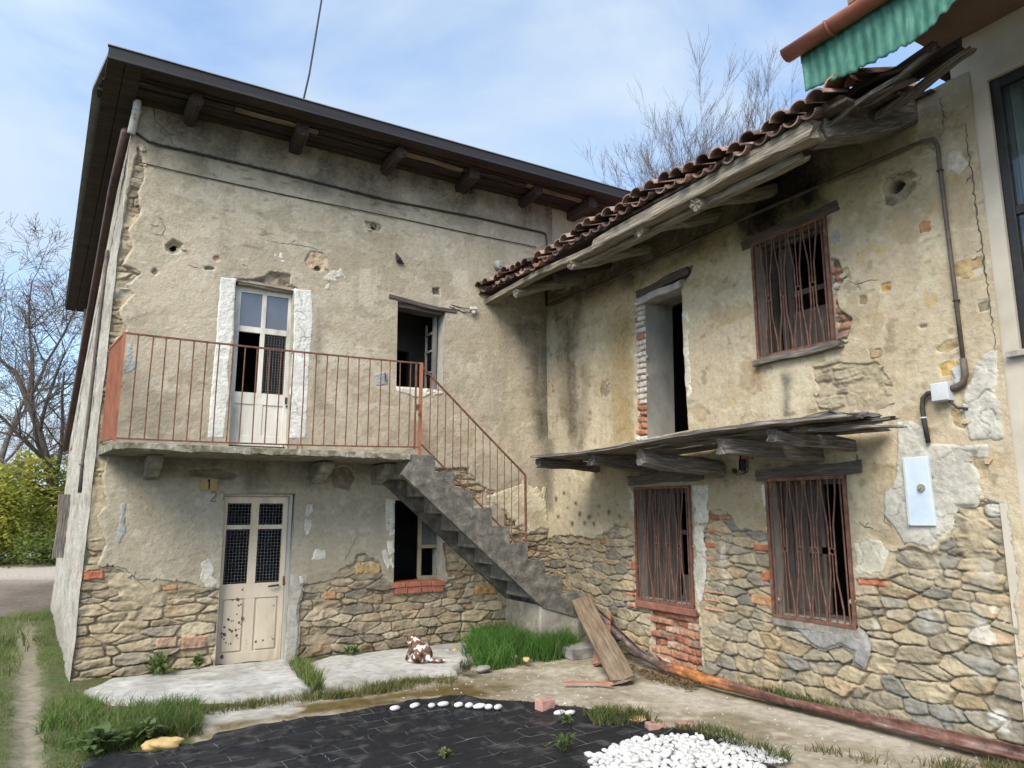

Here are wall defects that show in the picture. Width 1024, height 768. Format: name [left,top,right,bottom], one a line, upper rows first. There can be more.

flaking render [305,249,328,271]
flaking render [831,260,852,343]
flaking render [881,165,921,206]
crack [940,97,996,349]
flaking render [70,144,274,682]
flaking render [813,348,894,413]
flaking render [951,350,1004,441]
flaking render [294,498,519,658]
flaking render [505,485,1024,747]